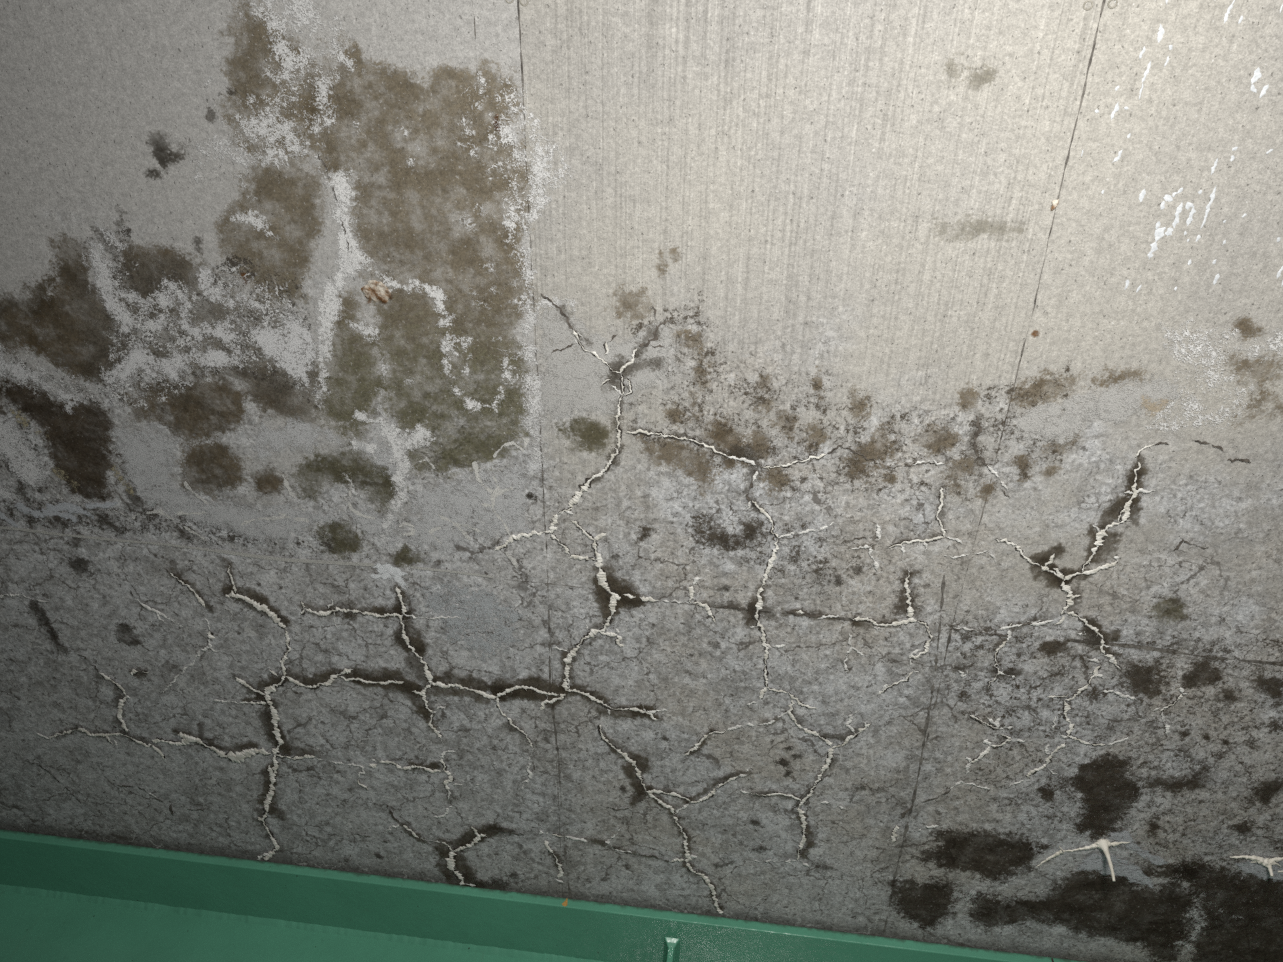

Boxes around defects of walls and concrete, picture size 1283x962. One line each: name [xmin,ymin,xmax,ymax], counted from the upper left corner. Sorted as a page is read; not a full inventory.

crack [25,293,1251,914]
water stain [0,0,1283,663]
water stain [777,746,801,778]
water stain [877,597,1283,962]